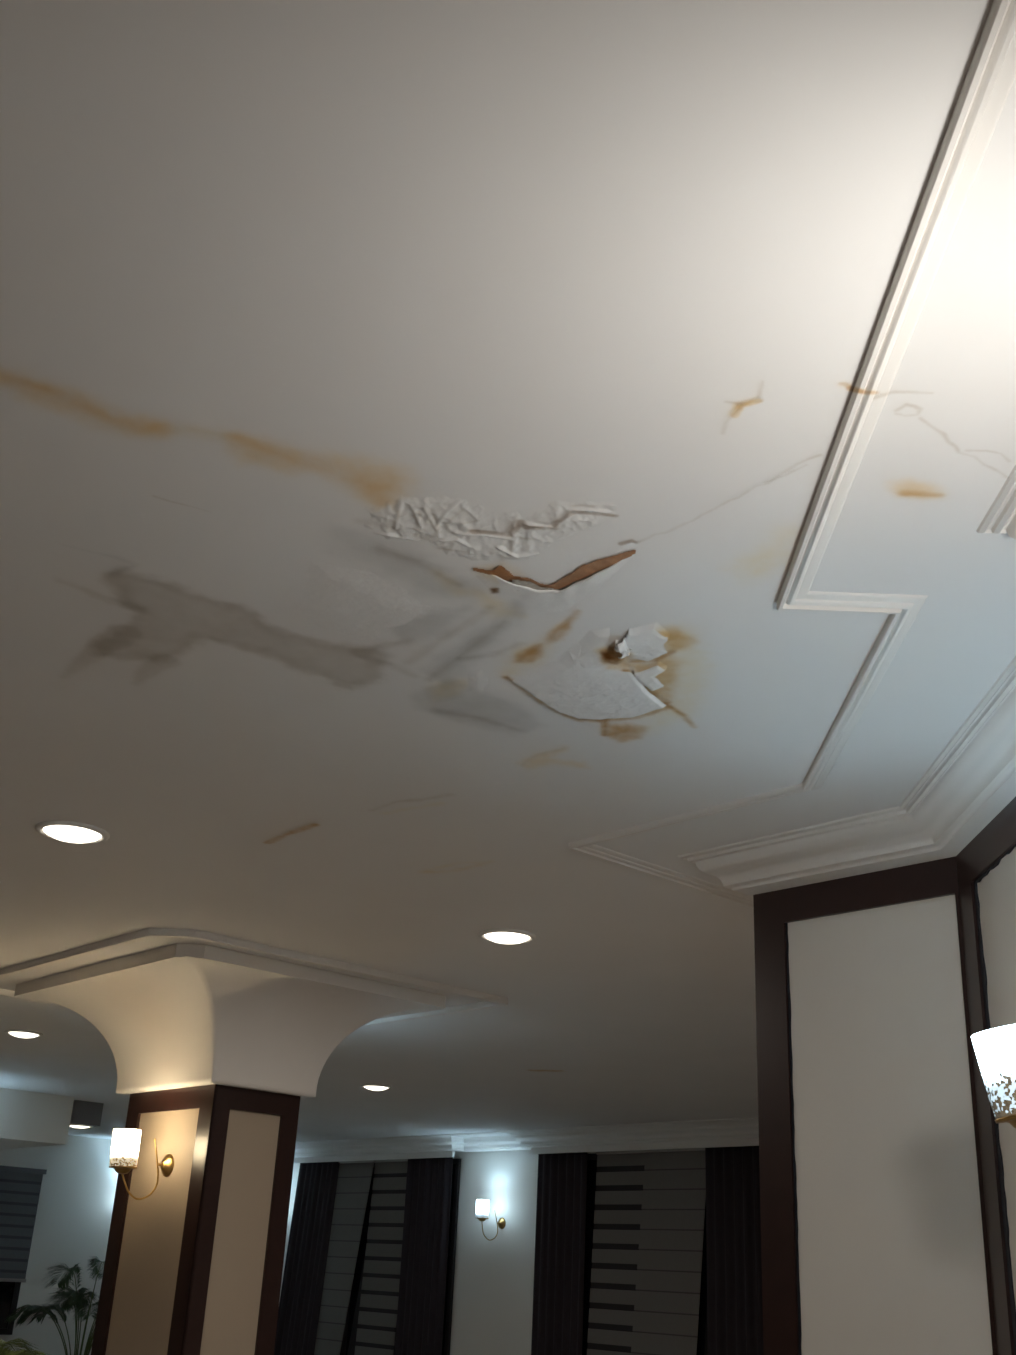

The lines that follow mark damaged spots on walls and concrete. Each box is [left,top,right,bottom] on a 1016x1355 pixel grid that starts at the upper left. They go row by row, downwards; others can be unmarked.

peeling [507,622,670,720]